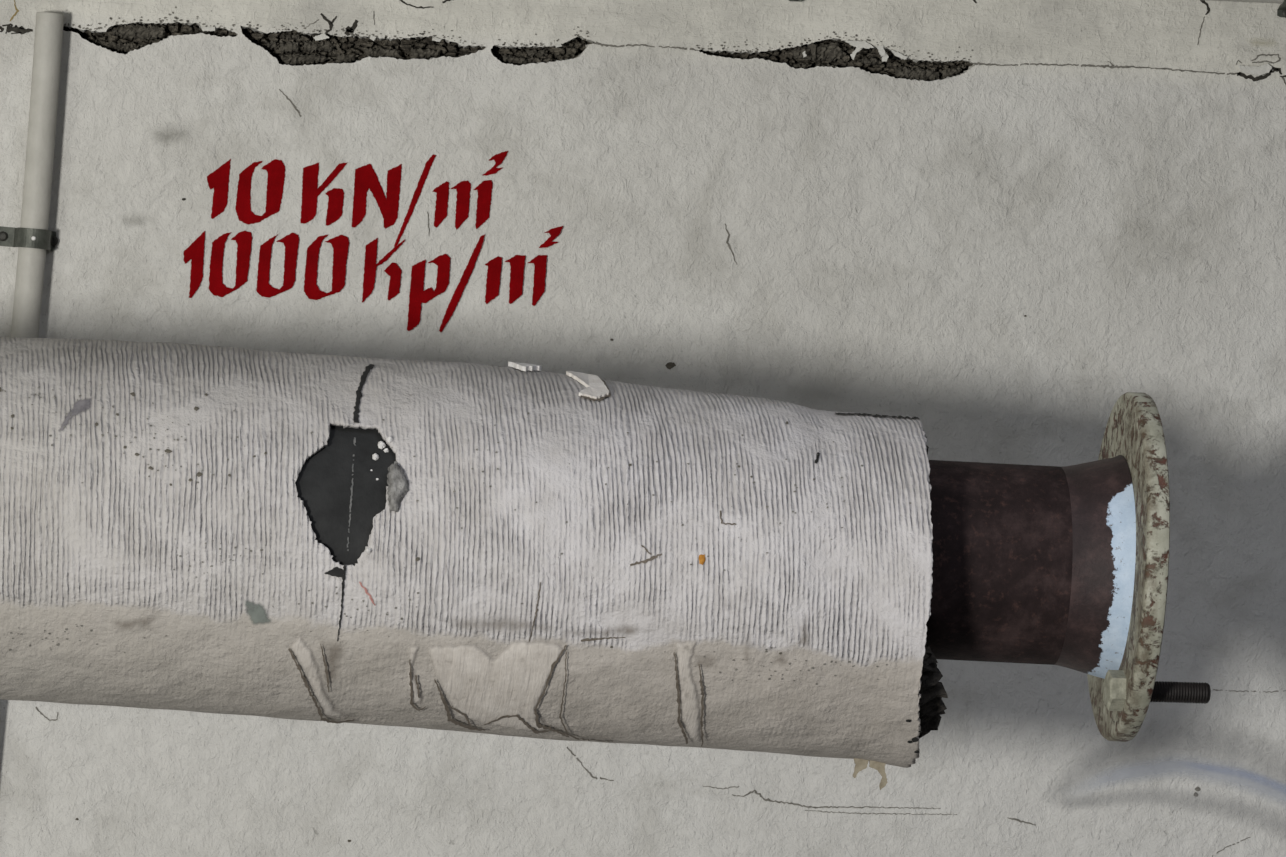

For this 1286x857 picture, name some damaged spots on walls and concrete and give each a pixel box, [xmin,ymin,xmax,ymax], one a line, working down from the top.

crack [0,0,33,35]
flaking render [63,6,595,66]
crack [306,0,451,36]
crack [595,41,694,50]
flaking render [696,31,973,81]
crack [703,786,957,815]